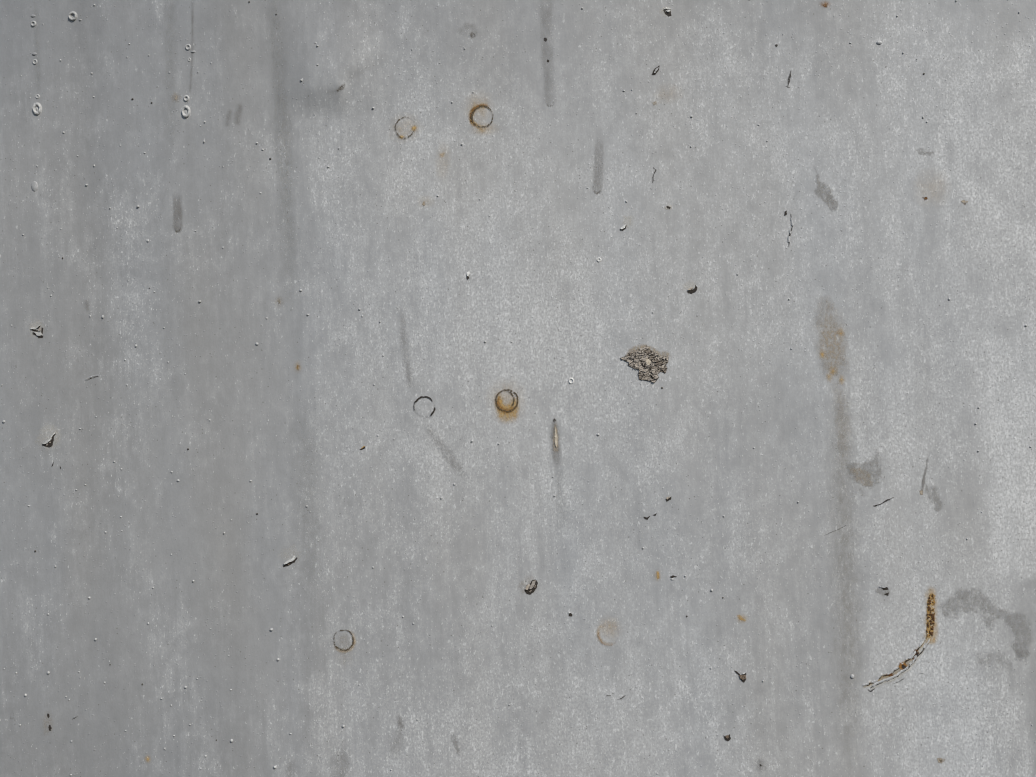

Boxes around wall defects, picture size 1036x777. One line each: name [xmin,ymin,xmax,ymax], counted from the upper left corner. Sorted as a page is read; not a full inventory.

peeling [620,345,669,383]
rust [497,392,517,418]
rust [926,593,935,641]